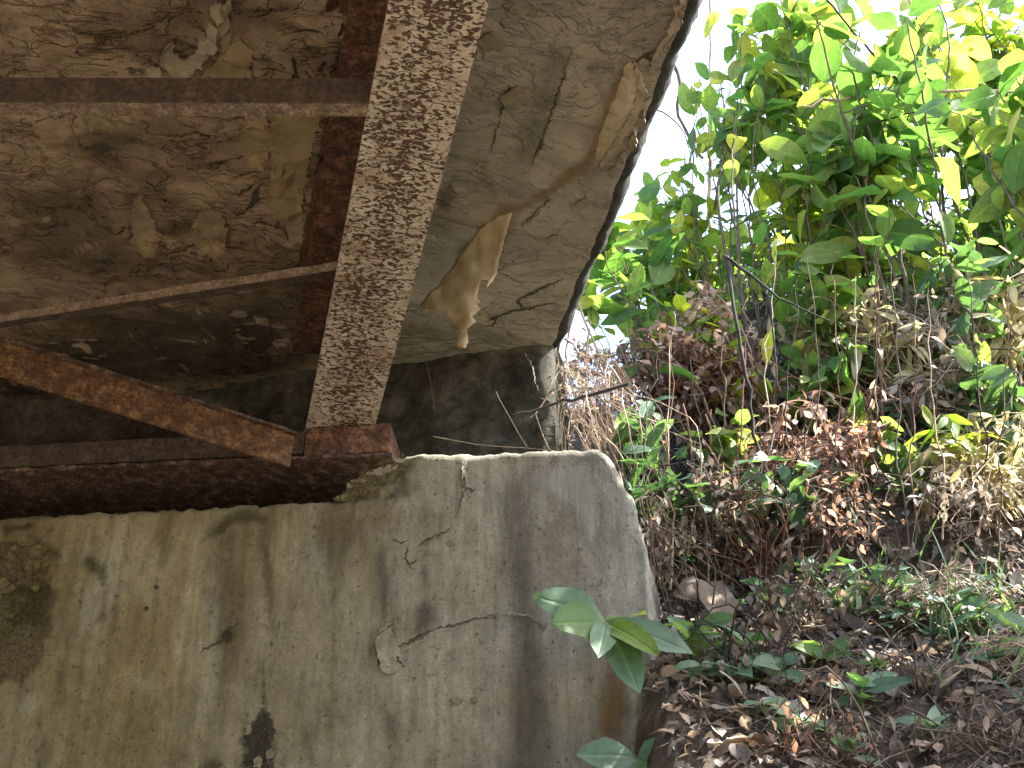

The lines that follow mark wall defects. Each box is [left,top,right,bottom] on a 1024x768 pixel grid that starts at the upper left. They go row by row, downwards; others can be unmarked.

flaking render [147,0,254,78]
rust [326,0,349,37]
crack [489,87,511,153]
crack [528,51,573,176]
rust [297,116,331,267]
crack [485,279,563,327]
spalling [333,459,409,503]
crack [393,461,476,570]
crack [398,612,545,653]
damp [238,684,276,768]